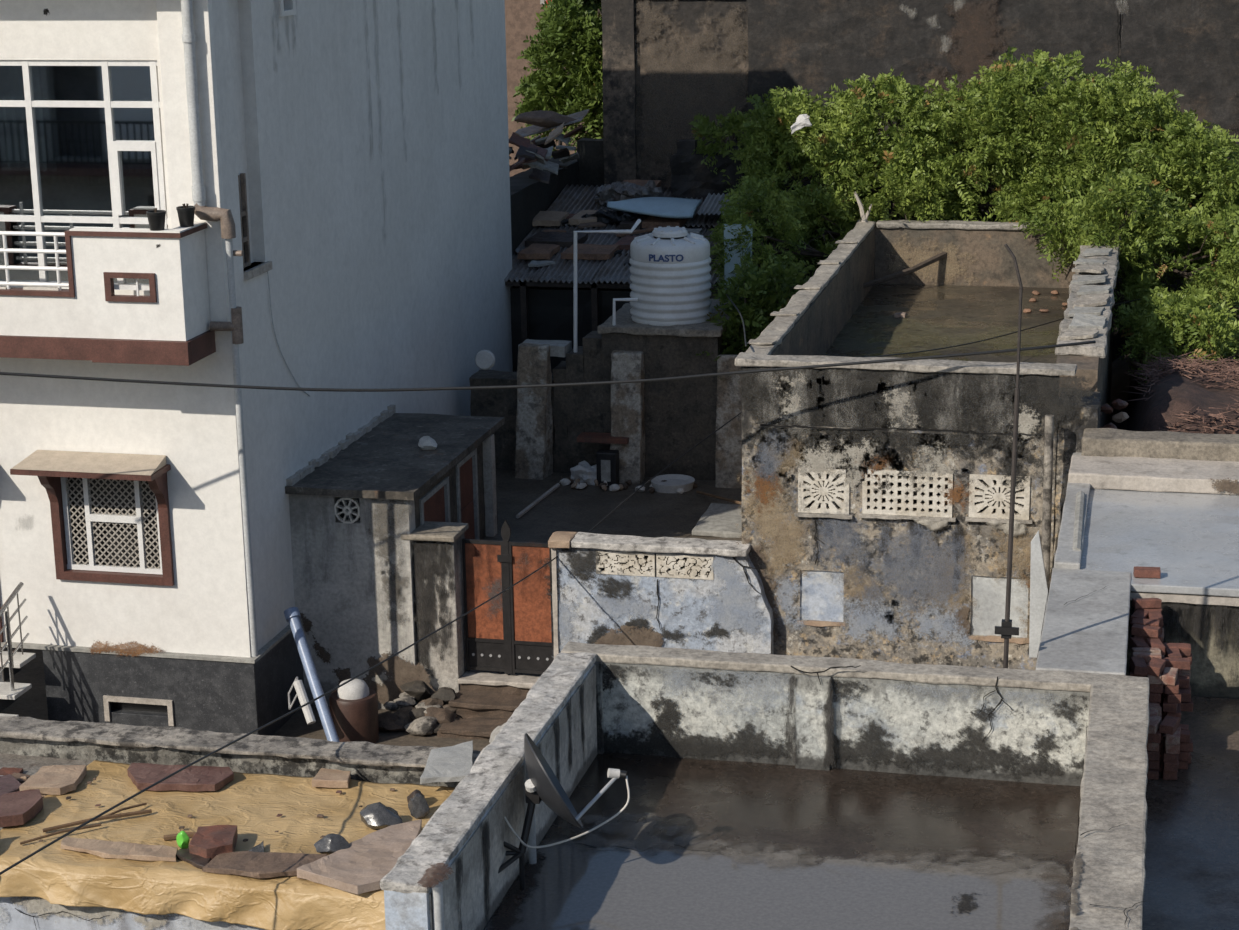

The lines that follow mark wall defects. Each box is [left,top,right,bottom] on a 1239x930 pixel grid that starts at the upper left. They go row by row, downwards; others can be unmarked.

flaking render [772,373,807,420]
flaking render [883,388,923,431]
flaking render [1002,406,1039,441]
spalling [1052,391,1101,562]
water stain [368,499,460,677]
crack [654,579,662,631]
spalling [989,533,1032,592]
water stain [823,679,1088,782]
crack [979,676,1013,742]